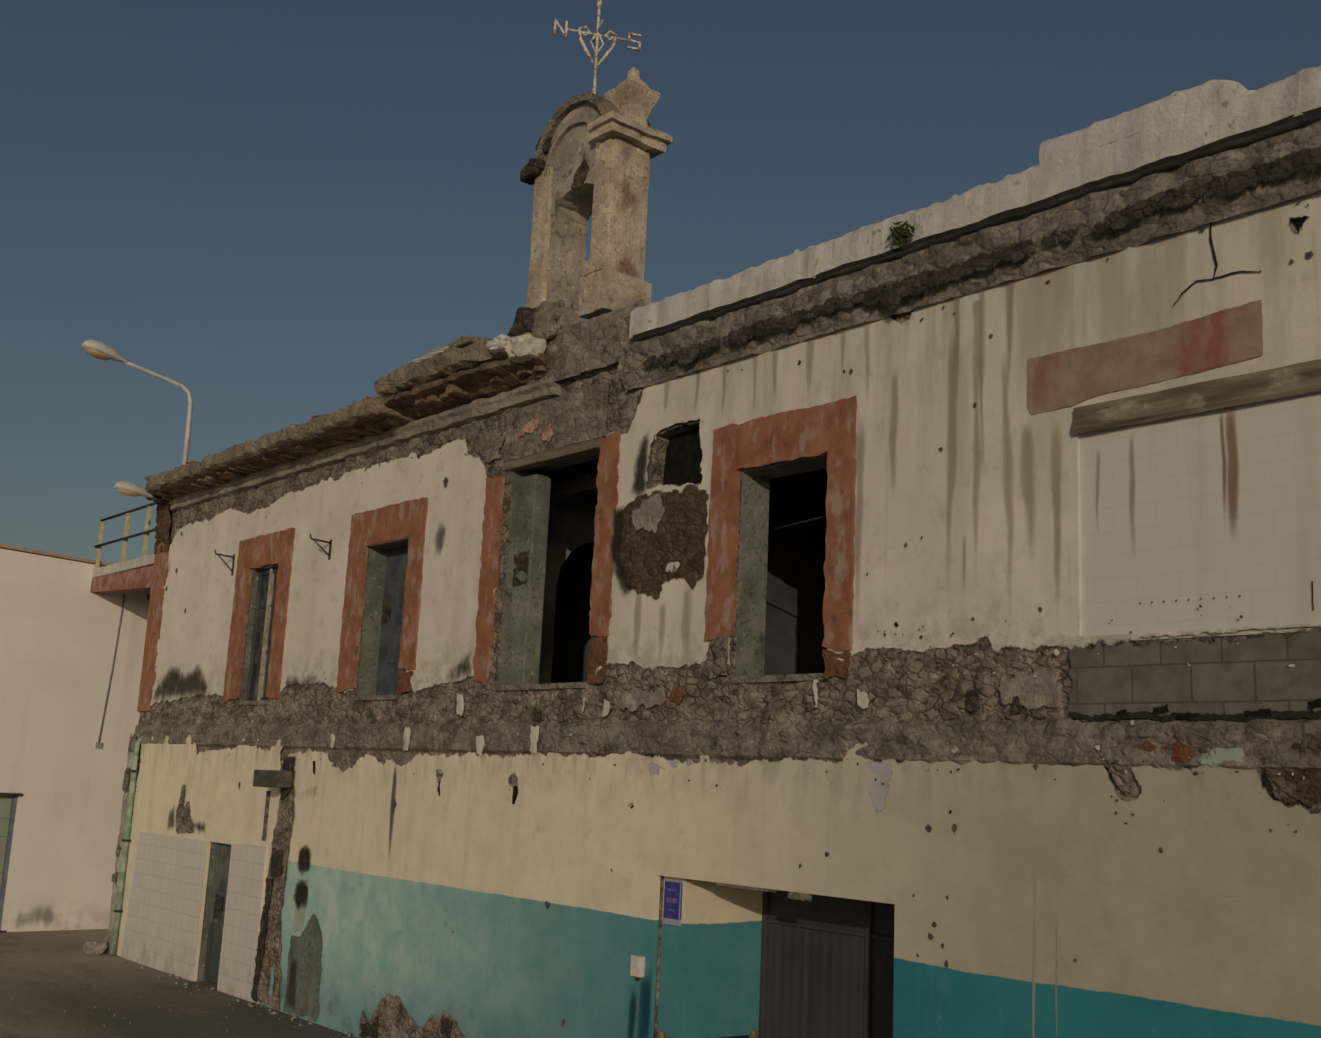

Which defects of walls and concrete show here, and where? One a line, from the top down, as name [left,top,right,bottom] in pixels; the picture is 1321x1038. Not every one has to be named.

crack [633,107,1321,339]
spalling [643,146,1321,367]
leakage [155,667,207,699]
flaking render [122,622,1073,793]
spalling [175,785,193,834]
peeling [847,744,893,813]
peeling [1131,741,1245,775]
spalling [1259,738,1321,807]
spalling [251,753,334,1021]
spalling [356,986,464,1038]